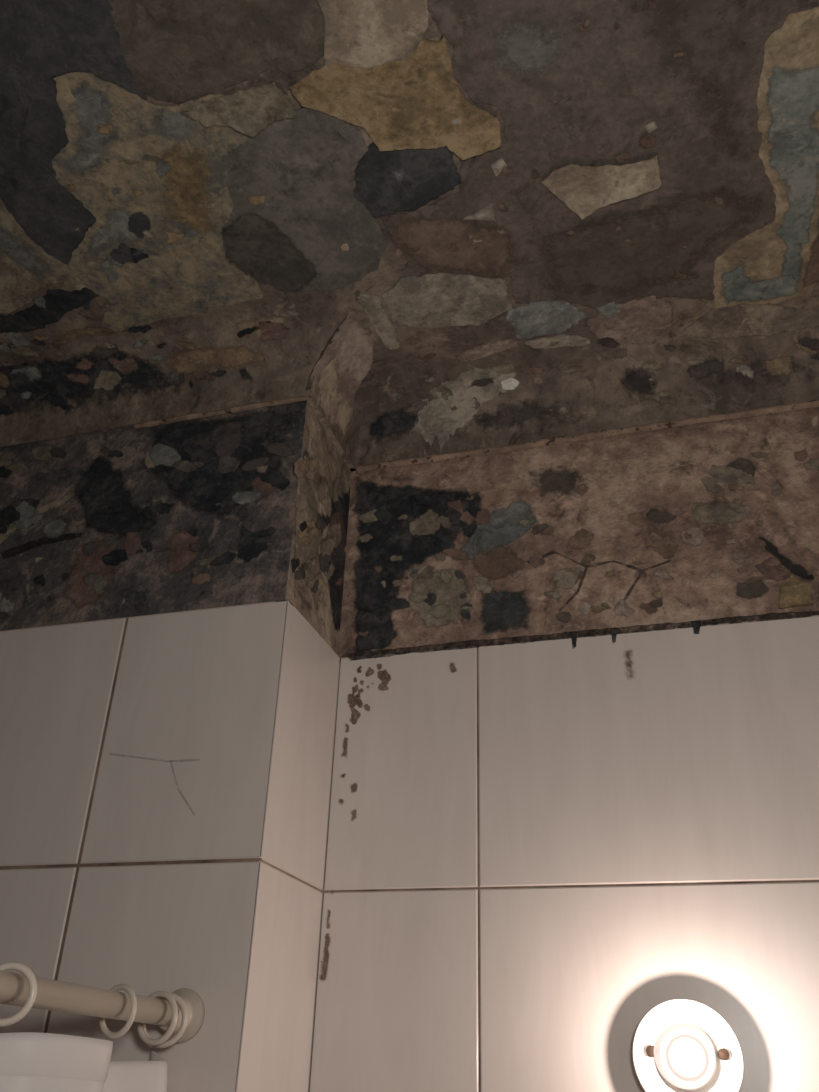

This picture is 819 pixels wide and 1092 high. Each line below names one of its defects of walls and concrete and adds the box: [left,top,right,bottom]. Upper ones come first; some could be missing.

leakage [621,359,656,396]
leakage [370,409,420,439]
leakage [476,401,559,429]
leakage [75,456,156,535]
leakage [153,411,292,517]
leakage [530,466,582,496]
leakage [328,478,481,653]
leakage [480,590,531,634]
leakage [342,664,391,756]
crack [109,753,200,815]
leakage [339,774,357,821]
leakage [320,910,330,980]